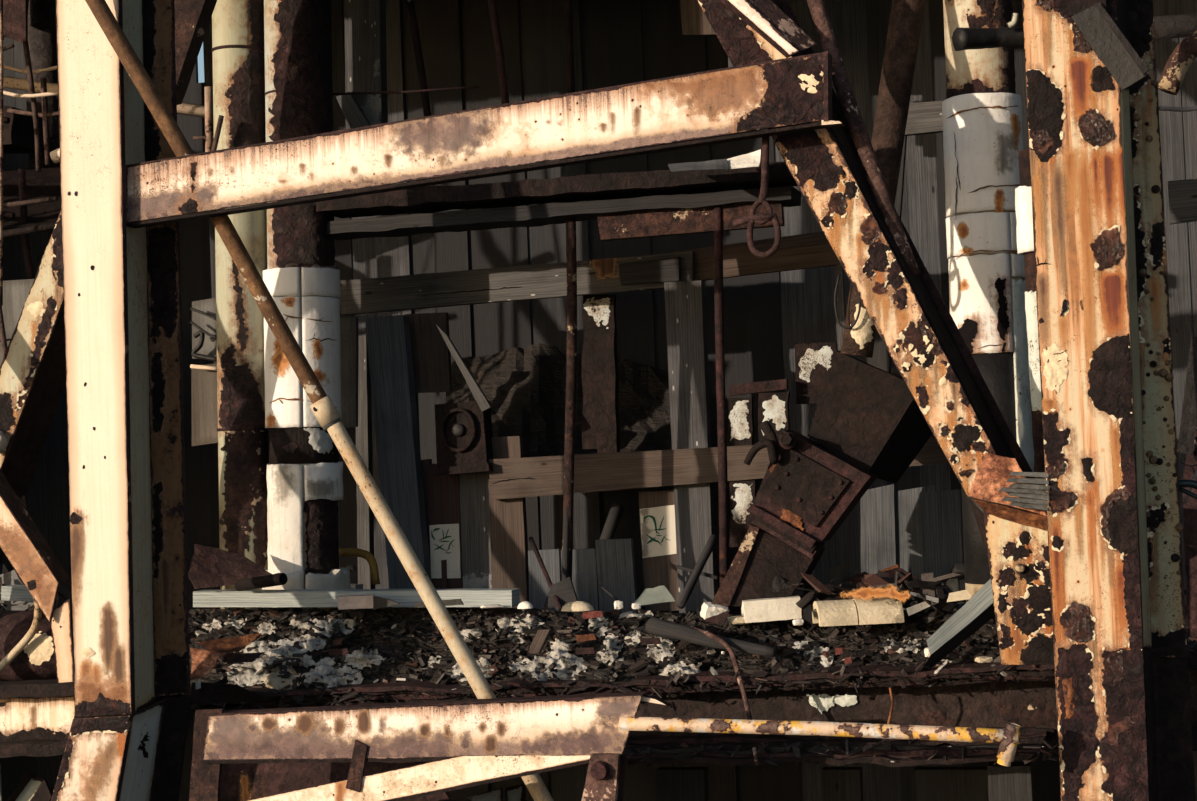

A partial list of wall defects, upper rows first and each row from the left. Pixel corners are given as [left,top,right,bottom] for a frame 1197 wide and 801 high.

corrosion [221,0,333,148]
corrosion [240,108,494,270]
corrosion [626,0,988,496]
peeling [799,346,833,382]
peeling [850,304,874,349]
peeling [901,335,933,370]
corrosion [946,0,1187,801]
peeling [56,580,72,608]
corrosion [0,602,150,801]
peeling [189,596,477,710]
corrosion [154,633,641,760]
peeling [446,567,1052,726]